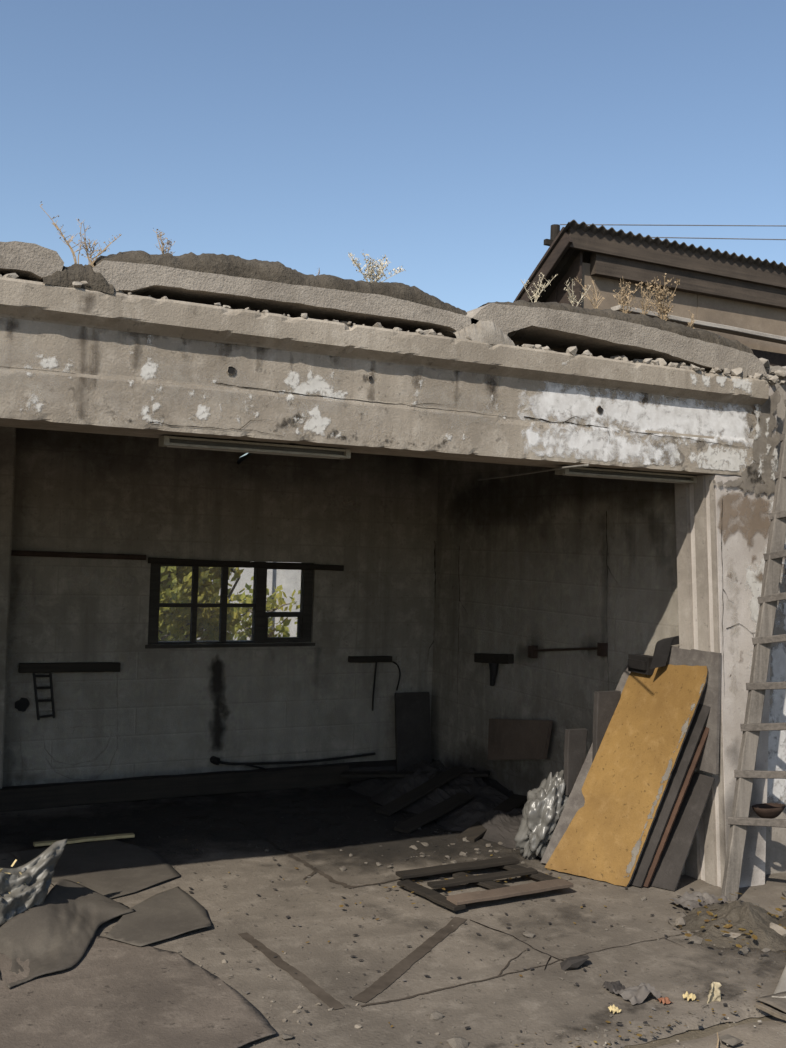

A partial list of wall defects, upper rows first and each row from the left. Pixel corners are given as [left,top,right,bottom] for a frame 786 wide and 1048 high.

peeling [129,358,162,424]
peeling [191,392,210,420]
crack [150,420,280,436]
peeling [280,370,348,437]
crack [219,383,750,448]
peeling [518,374,781,624]
leakage [211,659,228,750]
peeling [767,643,786,804]
crack [360,920,686,1007]